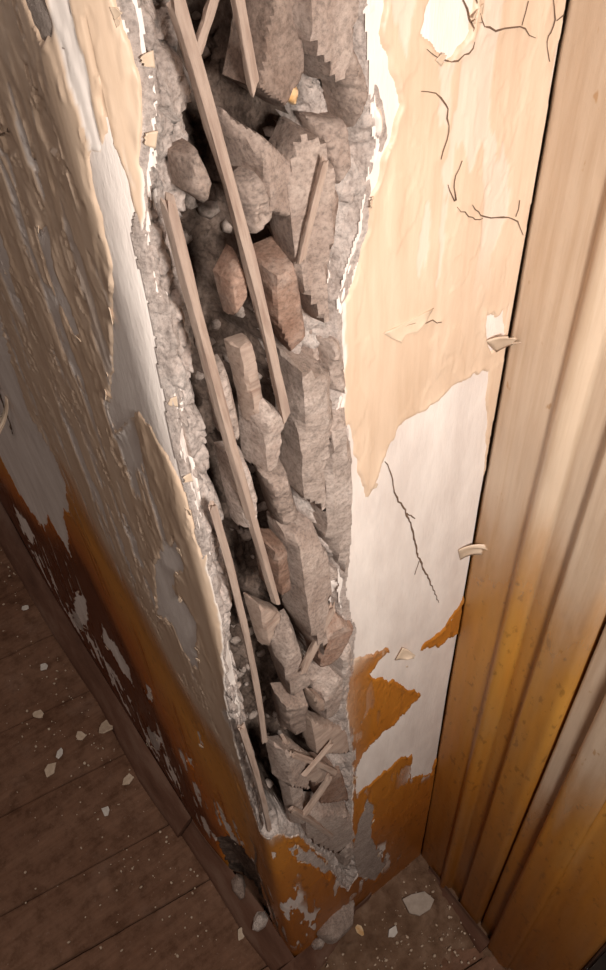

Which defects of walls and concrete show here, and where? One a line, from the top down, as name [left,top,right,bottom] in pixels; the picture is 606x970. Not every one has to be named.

peeling [26,0,52,41]
crack [427,0,564,63]
crack [421,91,523,234]
peeling [486,311,522,352]
flaking render [90,0,488,901]
peeling [0,316,183,794]
crack [385,462,439,603]